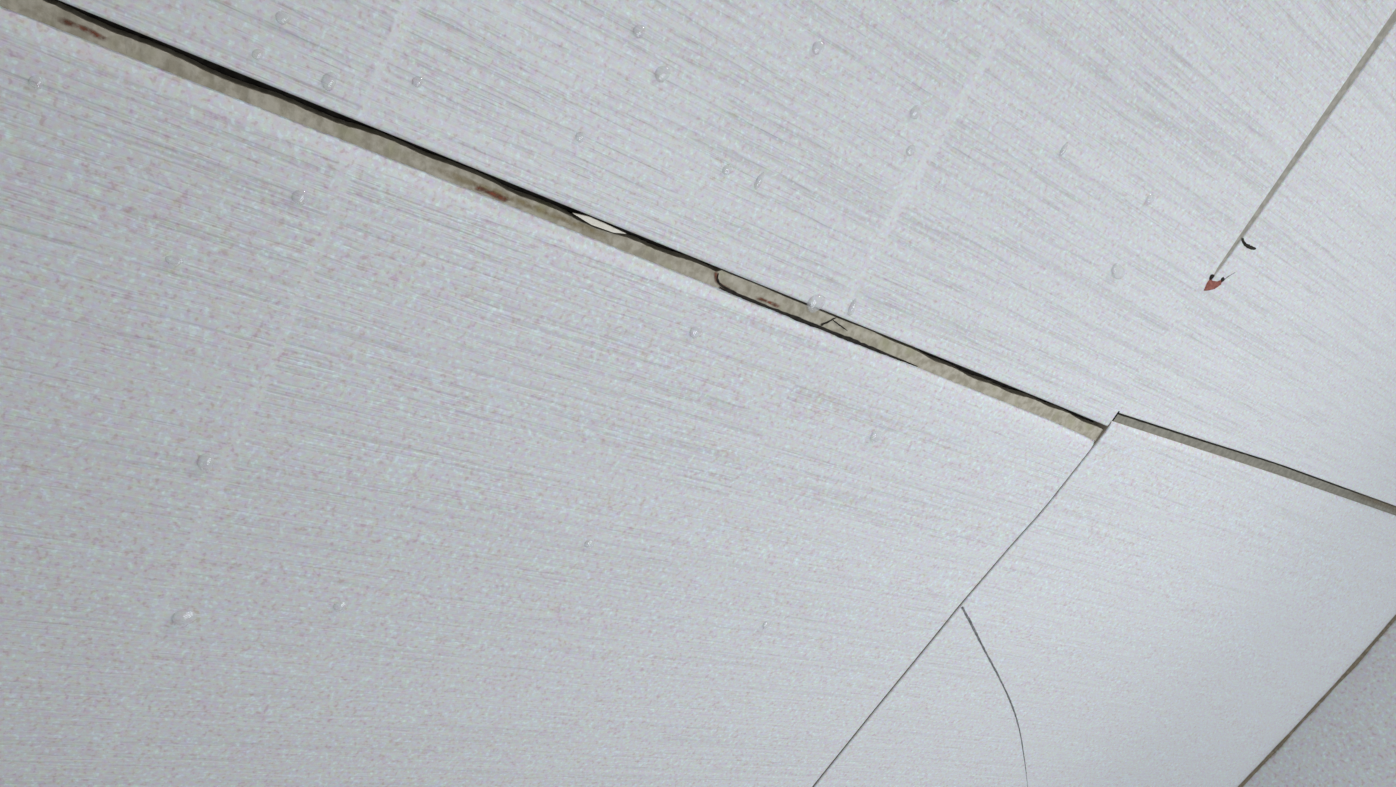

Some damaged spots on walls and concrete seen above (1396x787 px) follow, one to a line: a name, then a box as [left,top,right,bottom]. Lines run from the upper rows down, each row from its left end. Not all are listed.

crack [961,607,1028,787]